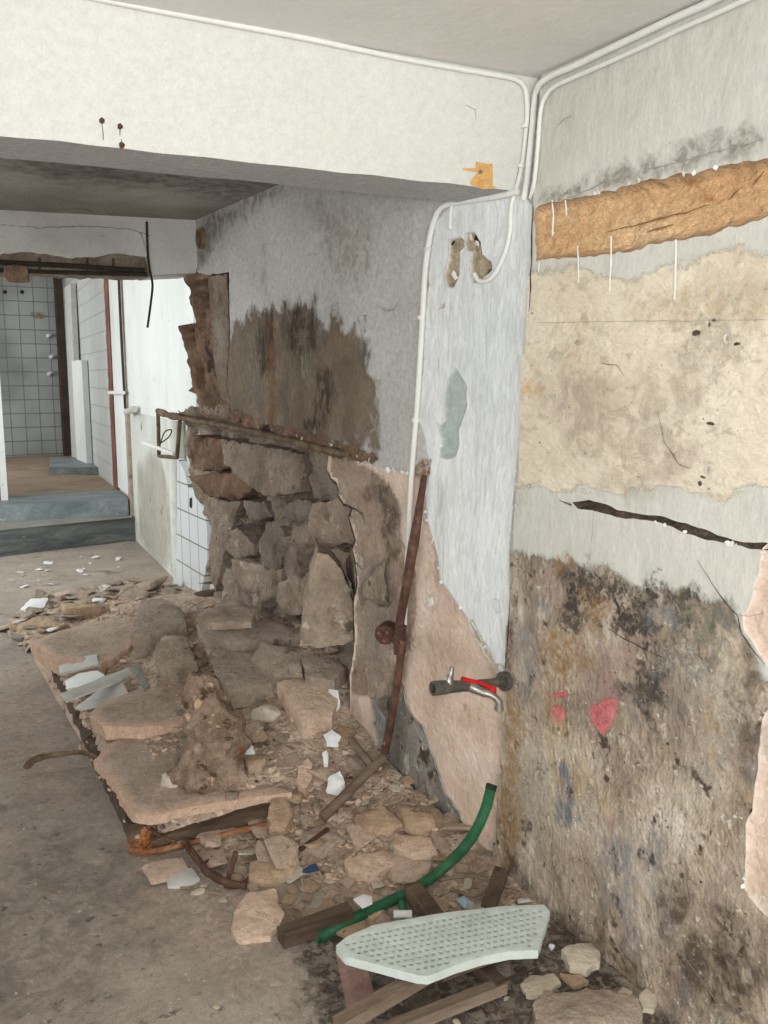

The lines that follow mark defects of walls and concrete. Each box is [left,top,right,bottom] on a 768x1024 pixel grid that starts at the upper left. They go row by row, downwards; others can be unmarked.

spalling [0,253,149,283]
damp [222,302,380,450]
flaking render [444,232,492,288]
peeling [514,158,768,505]
flaking render [208,274,505,852]
crack [560,500,768,664]
flaking render [742,544,768,667]
damp [493,550,768,1024]
flaking render [740,710,768,917]